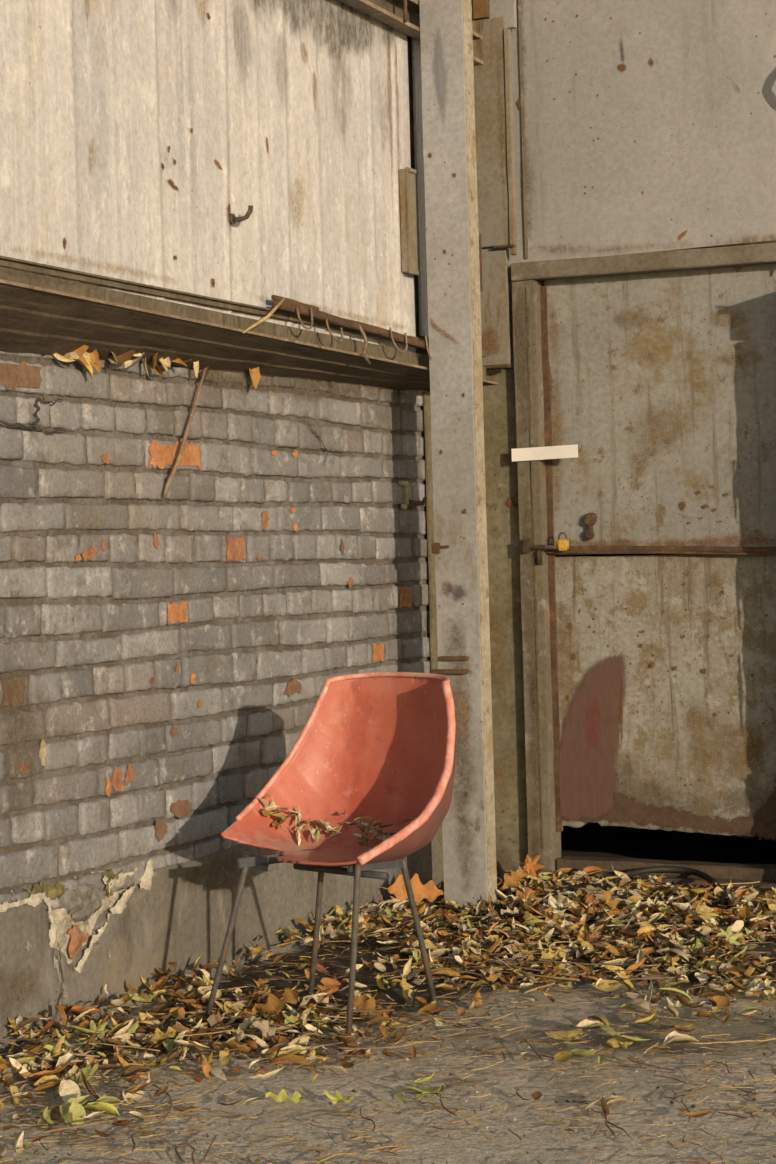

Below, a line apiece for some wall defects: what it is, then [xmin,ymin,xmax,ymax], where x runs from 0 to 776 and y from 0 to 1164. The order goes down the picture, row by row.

water stain [253,0,393,59]
spalling [0,361,42,390]
spalling [149,440,202,469]
spalling [226,536,263,562]
corrosion [540,286,776,840]
spalling [167,600,188,625]
spalling [0,859,154,973]